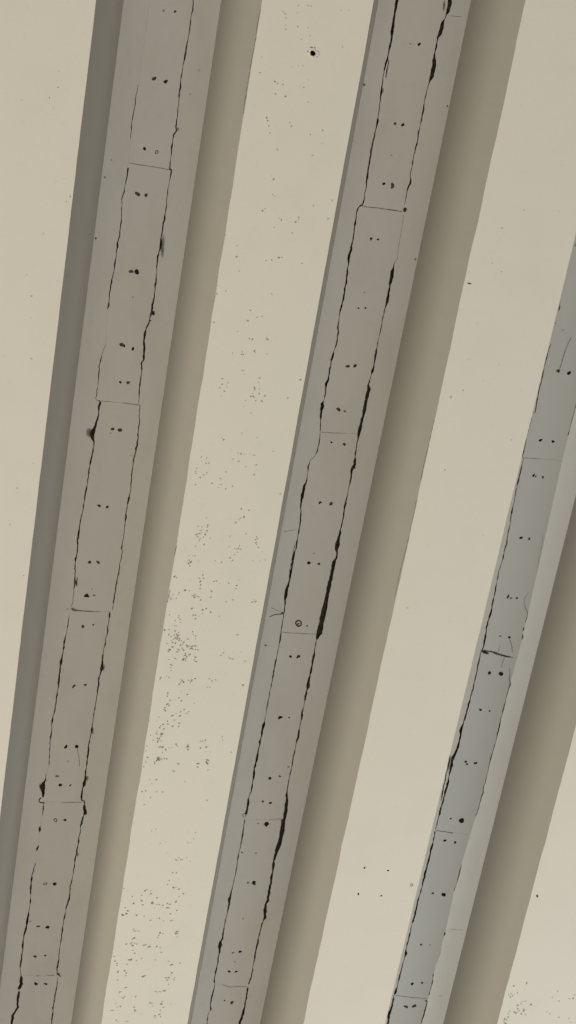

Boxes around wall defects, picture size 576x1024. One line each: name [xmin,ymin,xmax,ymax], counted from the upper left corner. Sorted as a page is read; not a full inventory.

crack [11,0,194,1024]
crack [207,0,459,1024]
crack [387,344,551,1024]